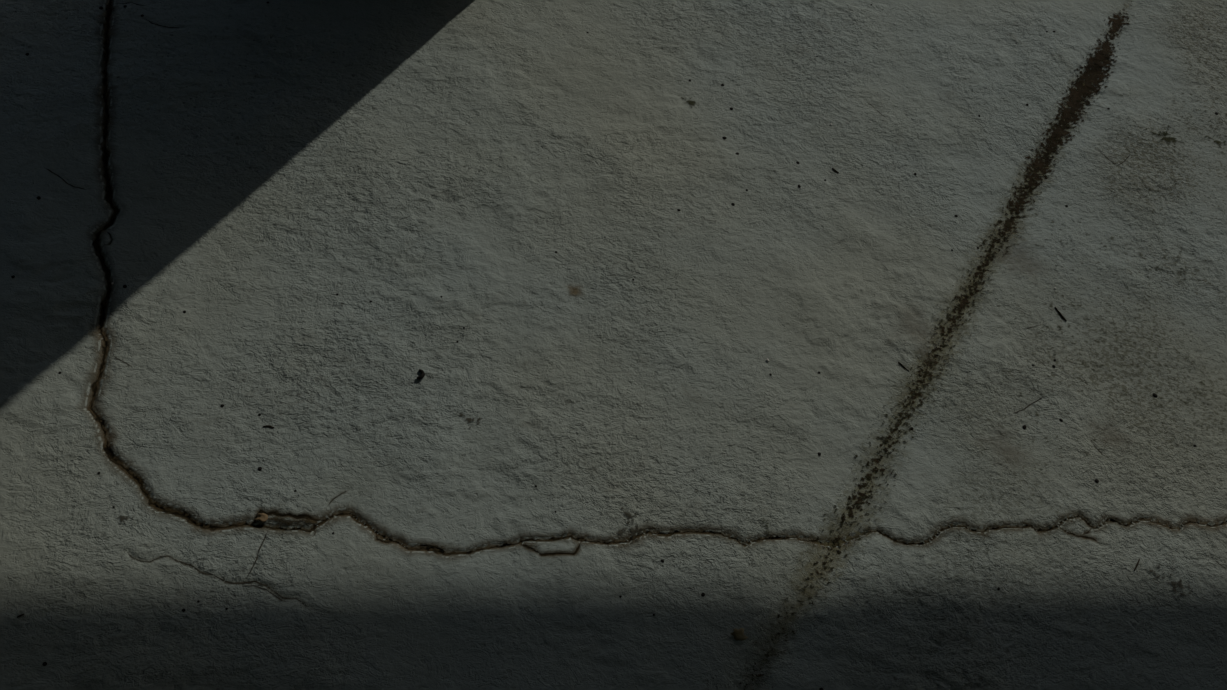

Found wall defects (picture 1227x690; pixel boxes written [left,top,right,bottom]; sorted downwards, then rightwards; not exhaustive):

crack [85,0,1227,557]
crack [169,533,304,604]